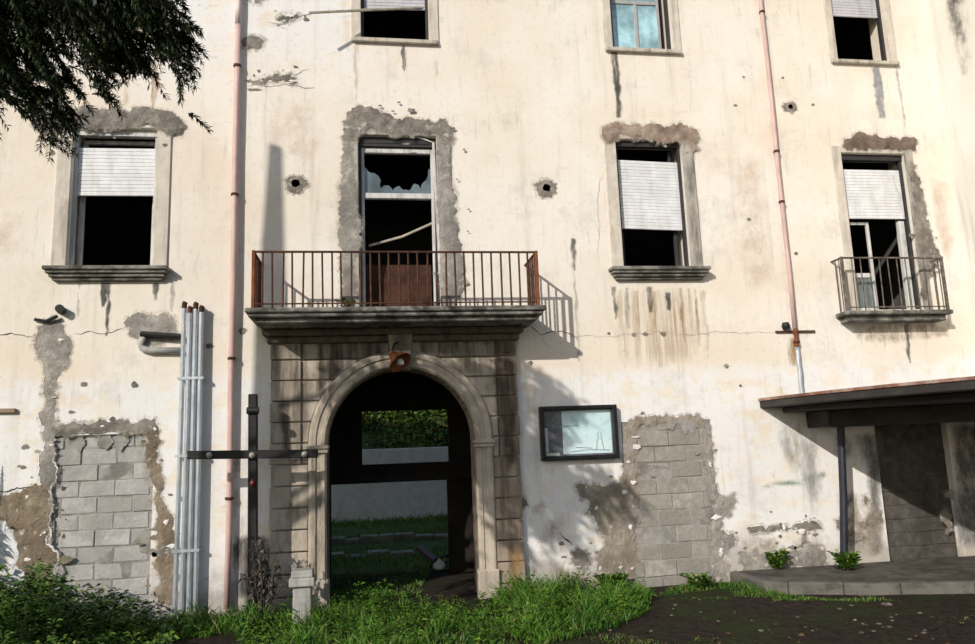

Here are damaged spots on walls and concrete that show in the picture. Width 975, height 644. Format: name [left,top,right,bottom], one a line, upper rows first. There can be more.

flaking render [64,103,185,147]
flaking render [600,121,700,153]
damp [873,67,885,117]
flaking render [336,101,470,301]
flaking render [842,130,943,300]
flaking render [0,311,187,606]
flaking render [558,411,828,587]
damp [848,434,881,551]
damp [955,425,975,542]